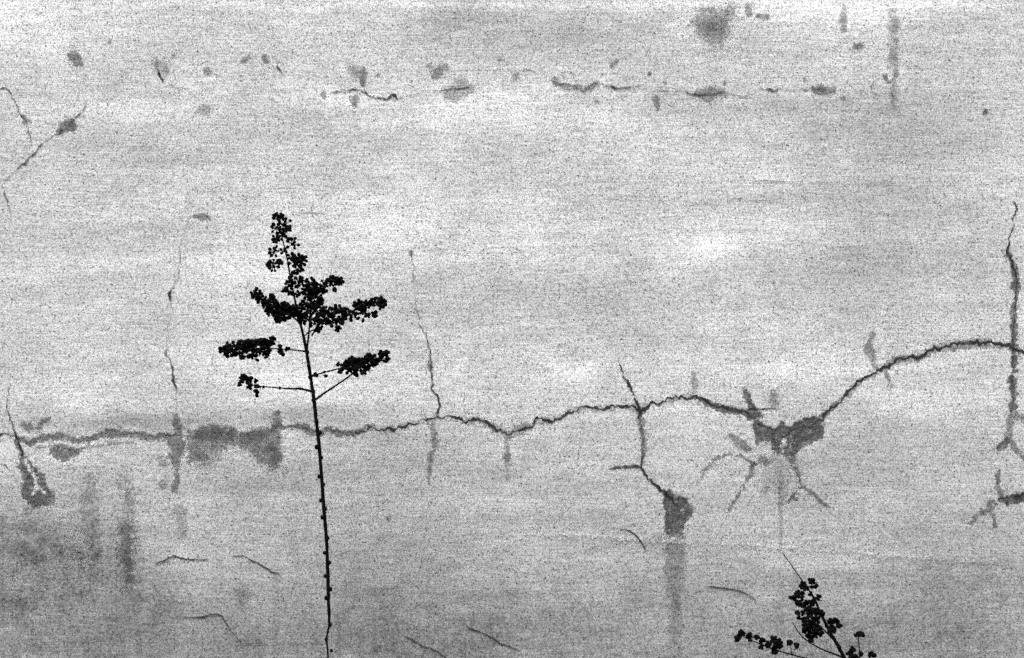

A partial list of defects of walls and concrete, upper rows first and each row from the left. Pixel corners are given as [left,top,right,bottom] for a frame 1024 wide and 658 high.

crack [320,64,400,106]
crack [497,58,675,103]
crack [164,349,177,391]
crack [279,201,1024,544]
crack [0,391,172,477]
leakage [155,410,286,492]
crack [154,555,280,574]